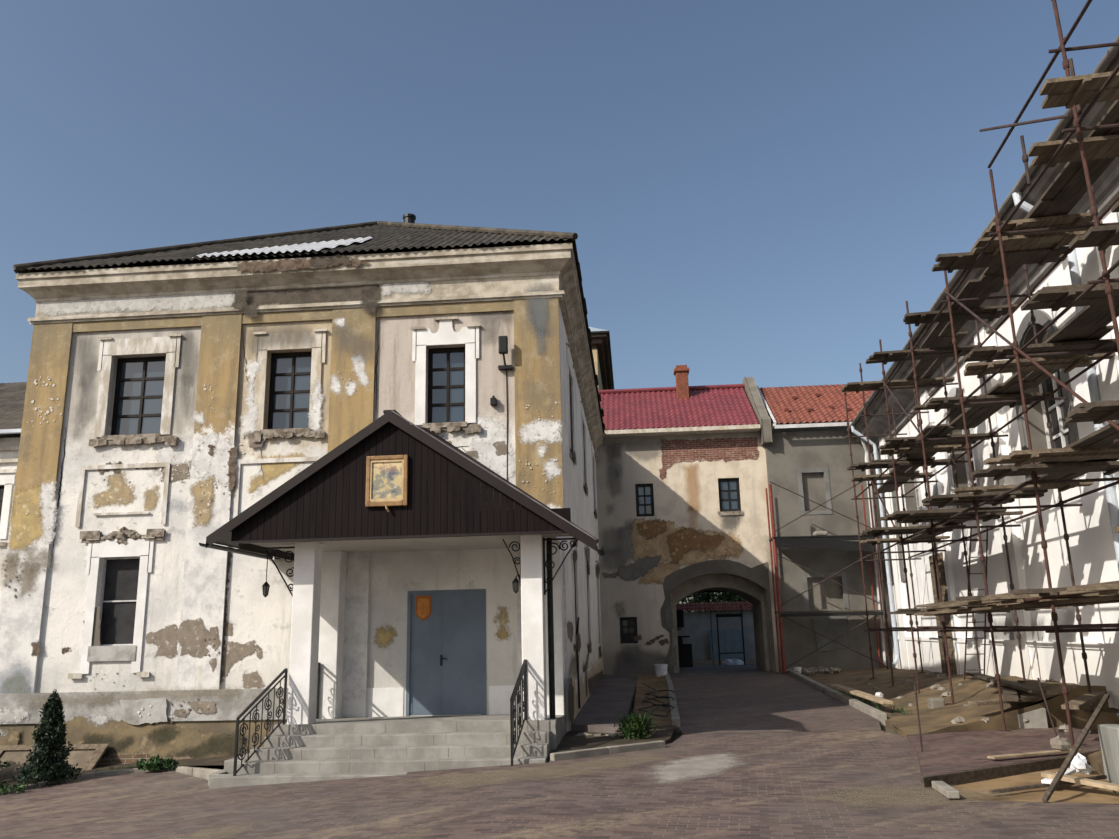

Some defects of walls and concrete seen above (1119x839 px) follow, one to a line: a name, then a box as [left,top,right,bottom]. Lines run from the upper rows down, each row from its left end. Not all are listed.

peeling [93,359,304,526]
peeling [466,402,562,492]
flaking render [659,437,759,480]
peeling [2,481,57,598]
peeling [573,540,619,579]
spalling [629,518,743,584]
spalling [567,620,602,697]
peeling [0,697,47,745]
water stain [83,735,132,756]
spalling [57,618,265,766]
water stain [149,726,178,743]
water stain [169,733,244,758]